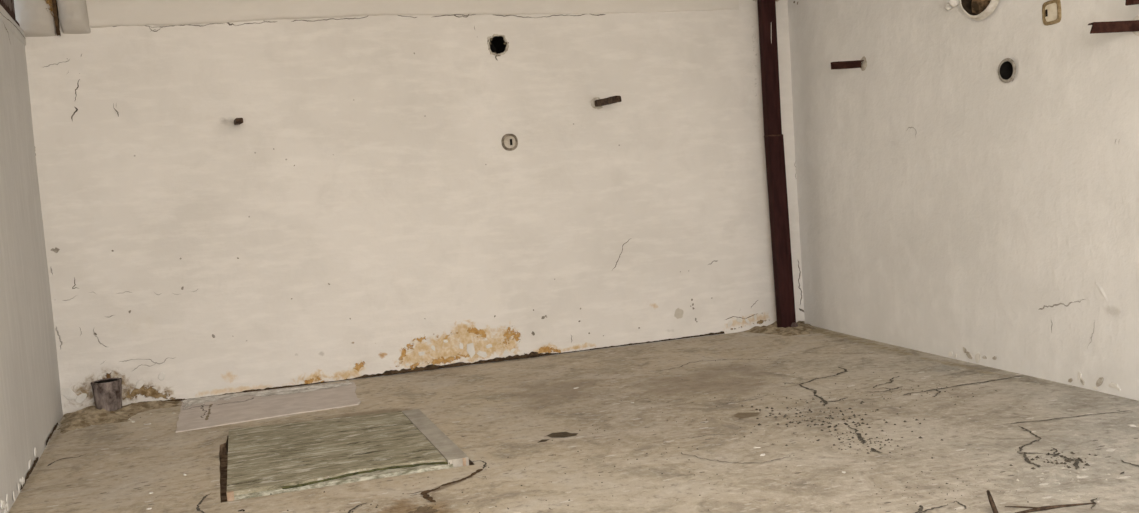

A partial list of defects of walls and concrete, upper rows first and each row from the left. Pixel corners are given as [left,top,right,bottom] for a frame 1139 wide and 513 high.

crack [145,16,368,32]
crack [398,14,606,29]
crack [43,0,82,121]
damp [60,366,180,409]
damp [194,368,275,398]
crack [873,376,1018,396]
crack [790,367,882,453]
crack [411,460,487,502]